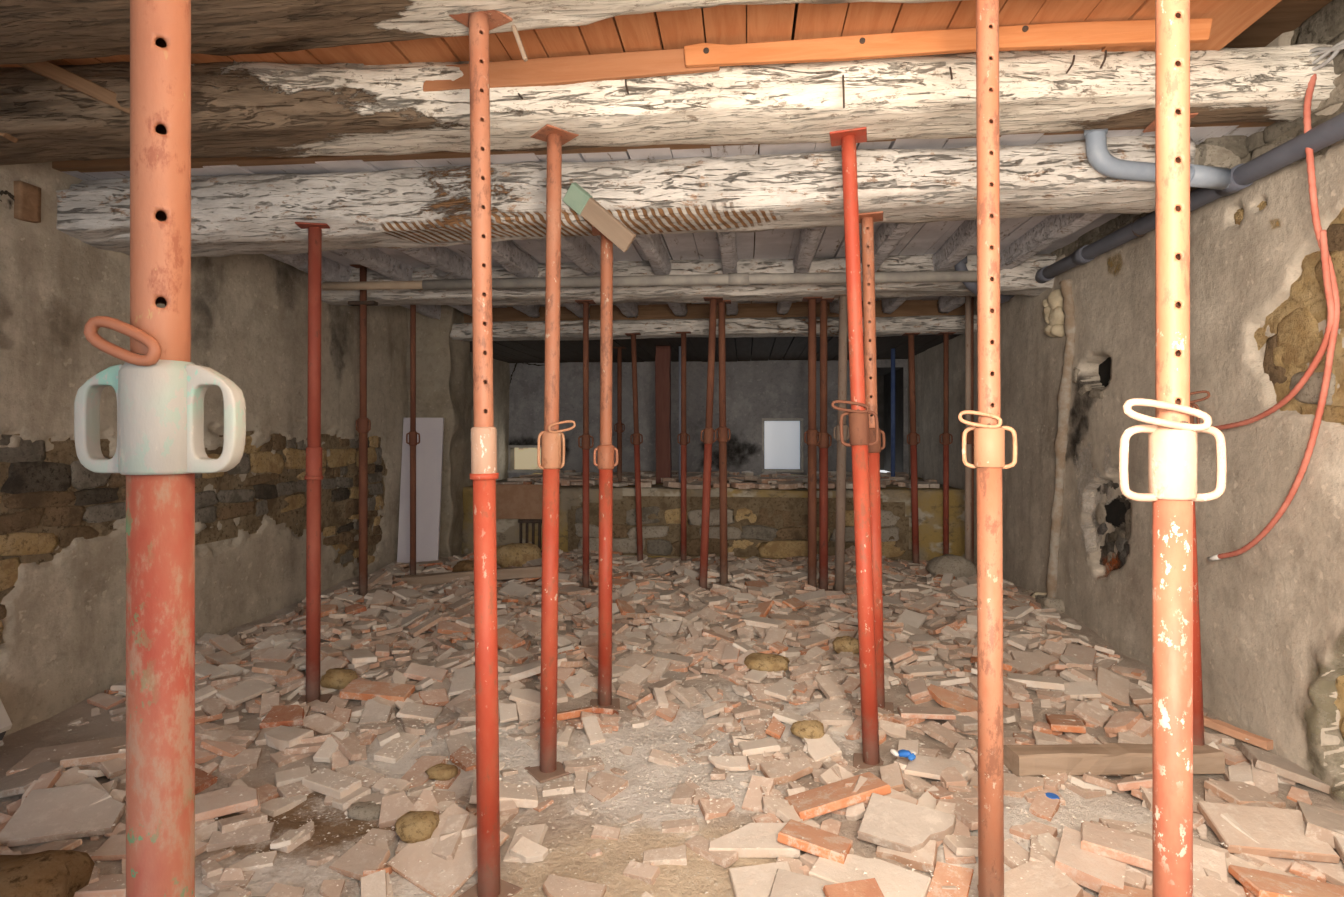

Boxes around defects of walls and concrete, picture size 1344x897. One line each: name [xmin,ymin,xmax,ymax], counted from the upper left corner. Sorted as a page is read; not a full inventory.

spalling [1072,357,1111,399]
flaking render [1254,208,1344,425]
flaking render [0,434,126,645]
flaking render [195,431,387,567]
flaking render [1093,480,1131,570]
flaking render [1334,675,1344,740]